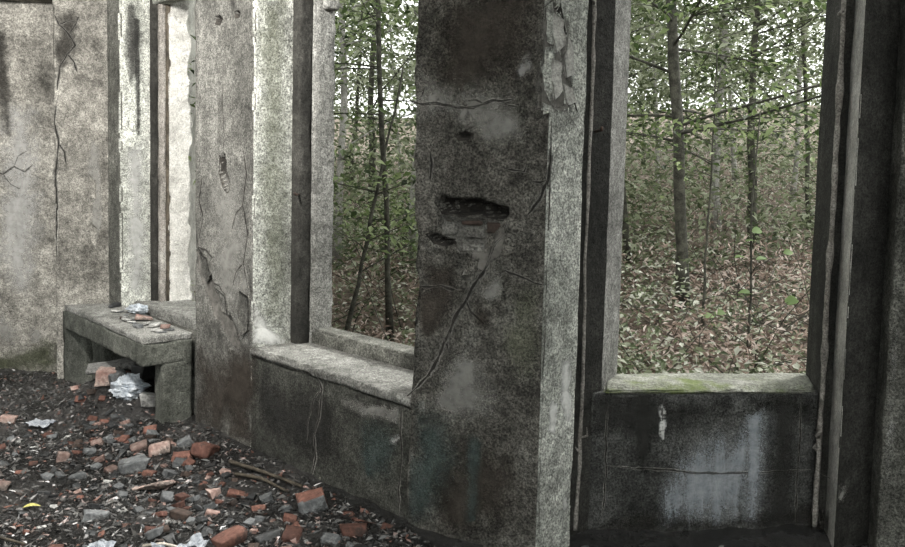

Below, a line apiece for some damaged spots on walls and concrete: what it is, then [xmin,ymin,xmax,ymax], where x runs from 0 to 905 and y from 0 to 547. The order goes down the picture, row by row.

leakage [0,34,8,127]
crack [0,15,80,260]
crack [410,88,518,110]
flaking render [536,1,577,114]
spalling [425,195,519,275]
crack [398,146,553,517]
leakage [595,393,829,532]